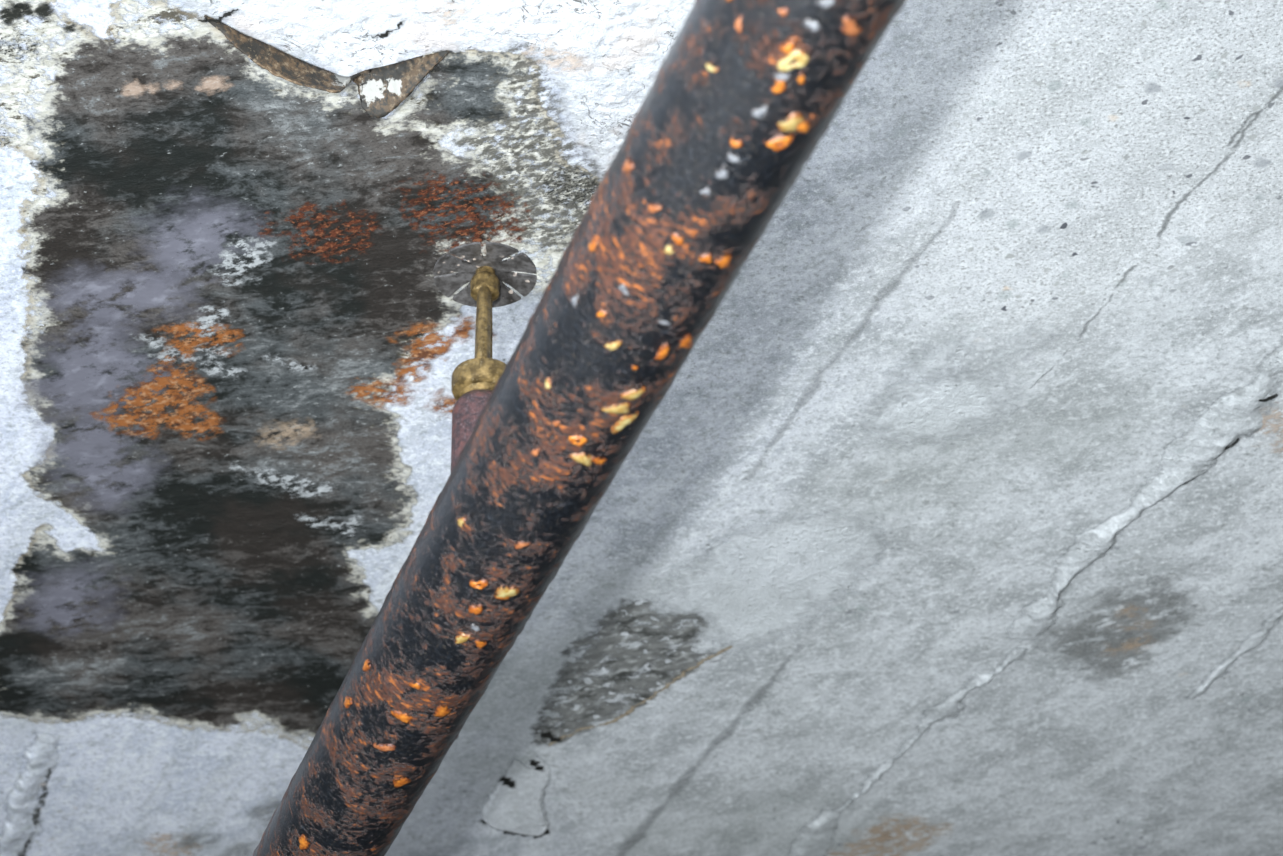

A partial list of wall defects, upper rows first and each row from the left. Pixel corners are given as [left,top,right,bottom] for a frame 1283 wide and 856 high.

mould [0,1,53,62]
mould [456,46,603,251]
crack [1158,88,1283,236]
corrosion [260,202,382,263]
corrosion [401,173,531,260]
water stain [30,210,276,508]
corrosion [93,322,242,440]
peeling [0,0,695,749]
corrosion [349,317,475,407]
crack [1259,394,1278,402]
efflorescence [230,465,332,497]
crack [18,768,51,856]